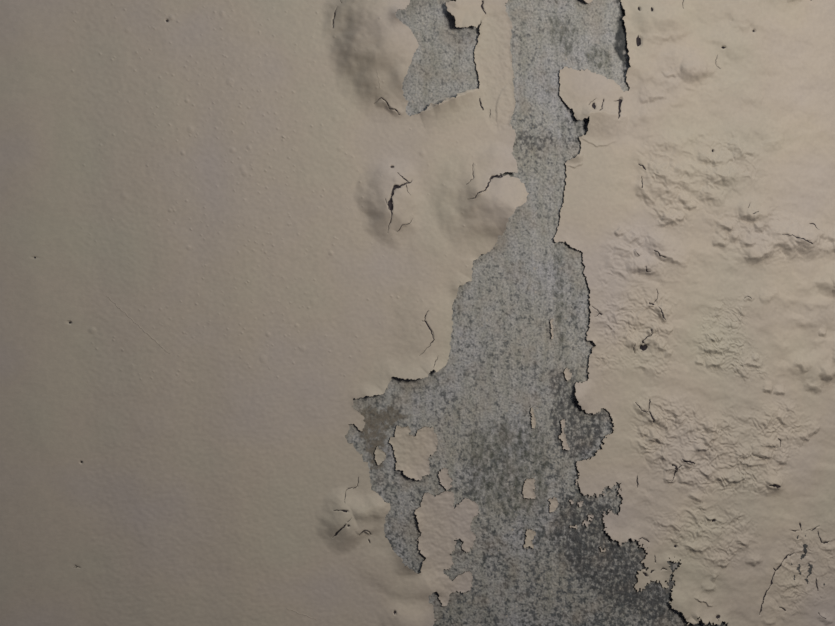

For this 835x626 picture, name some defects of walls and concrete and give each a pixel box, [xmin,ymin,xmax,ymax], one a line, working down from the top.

crack [385,172,412,231]
crack [467,168,503,199]
peeling [345,0,729,626]
crack [332,477,371,543]
crack [759,553,794,615]